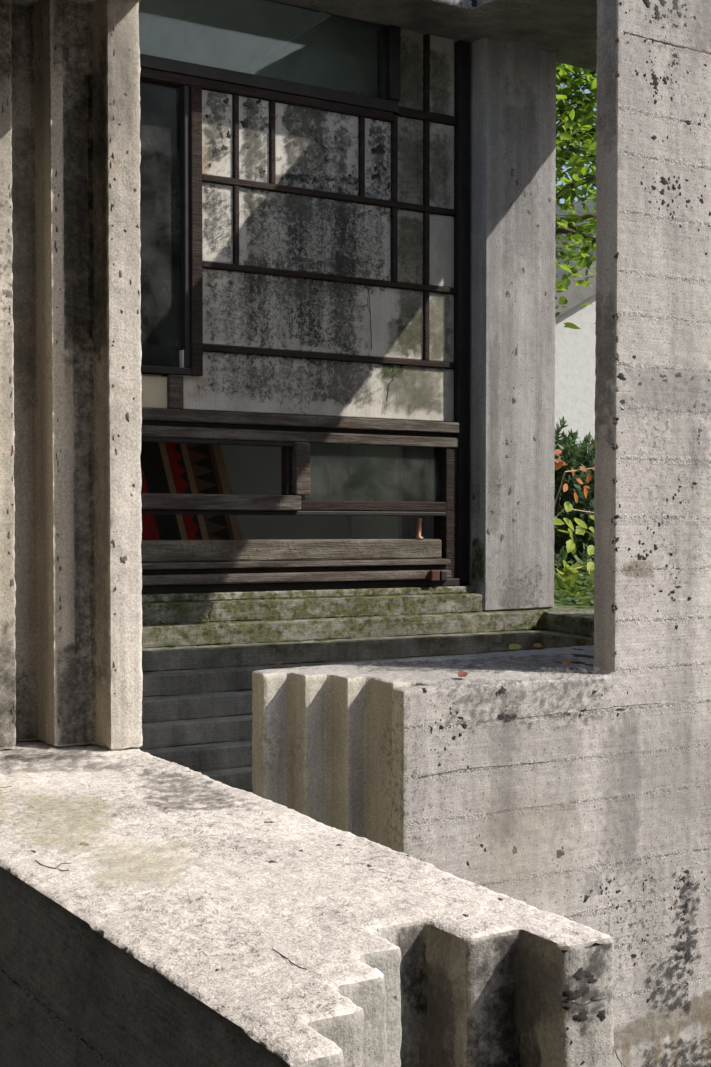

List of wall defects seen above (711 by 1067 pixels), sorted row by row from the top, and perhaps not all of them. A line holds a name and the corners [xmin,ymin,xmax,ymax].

water stain [55,1,108,384]
water stain [199,104,392,407]
water stain [0,394,252,815]
water stain [398,929,426,963]
water stain [562,943,612,1044]
water stain [612,863,711,1067]